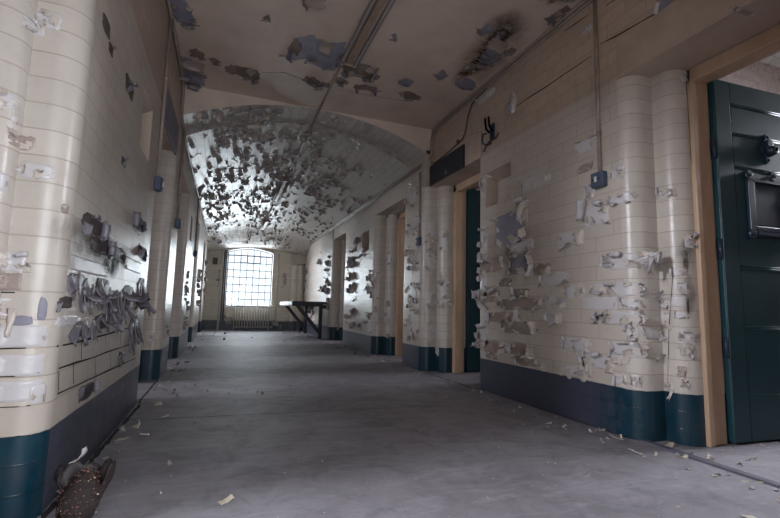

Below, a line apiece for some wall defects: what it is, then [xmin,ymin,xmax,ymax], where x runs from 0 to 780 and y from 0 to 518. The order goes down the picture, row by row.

peeling [7,126,36,151]
peeling [0,161,56,192]
peeling [171,0,200,30]
peeling [185,106,371,253]
peeling [279,35,381,96]
peeling [398,78,421,102]
peeling [0,212,157,405]
peeling [183,259,221,330]
peeling [316,237,391,339]
peeling [404,215,453,357]
peeling [471,195,570,371]
peeling [559,248,699,400]